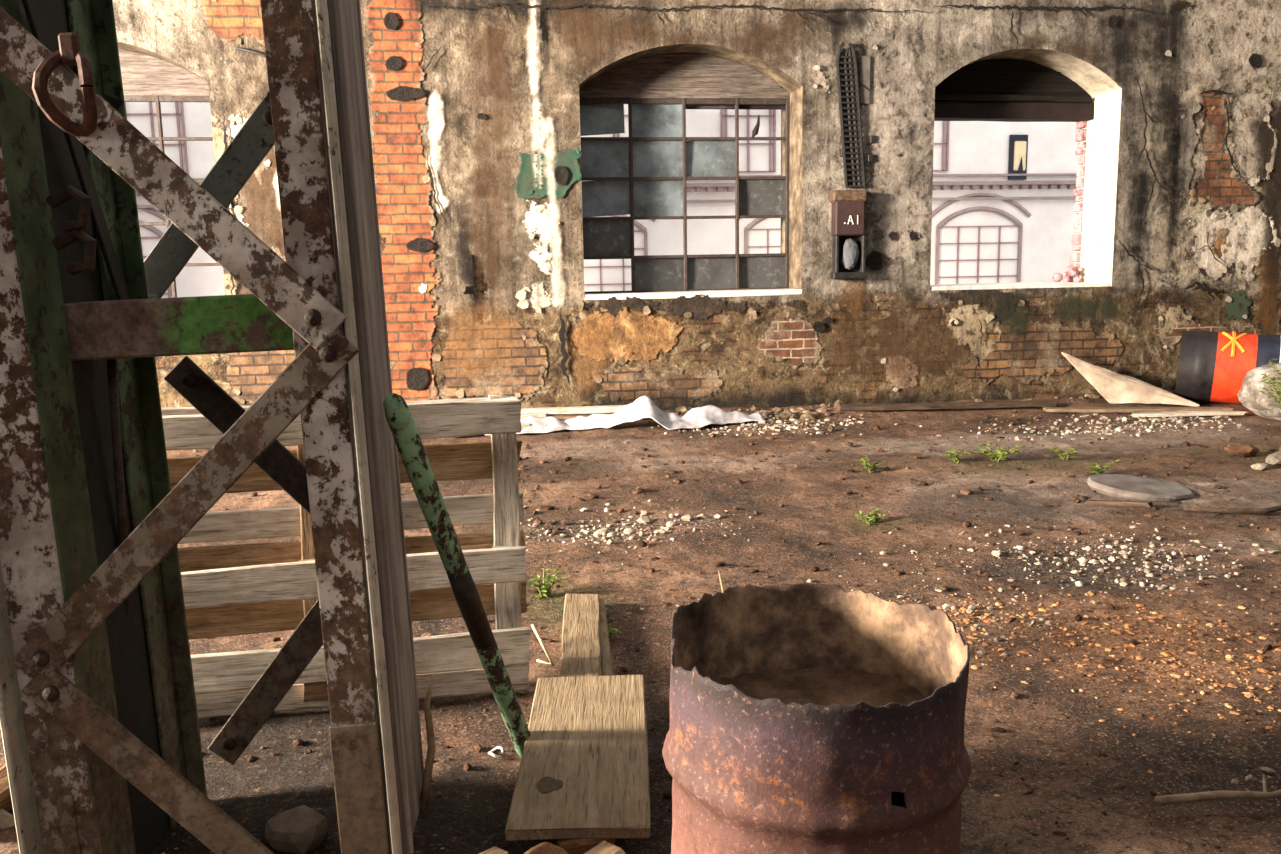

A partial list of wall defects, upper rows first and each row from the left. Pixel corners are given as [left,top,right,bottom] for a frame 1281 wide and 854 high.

water stain [1163,127,1180,260]
flaking render [1152,0,1281,351]
flaking render [569,294,825,408]